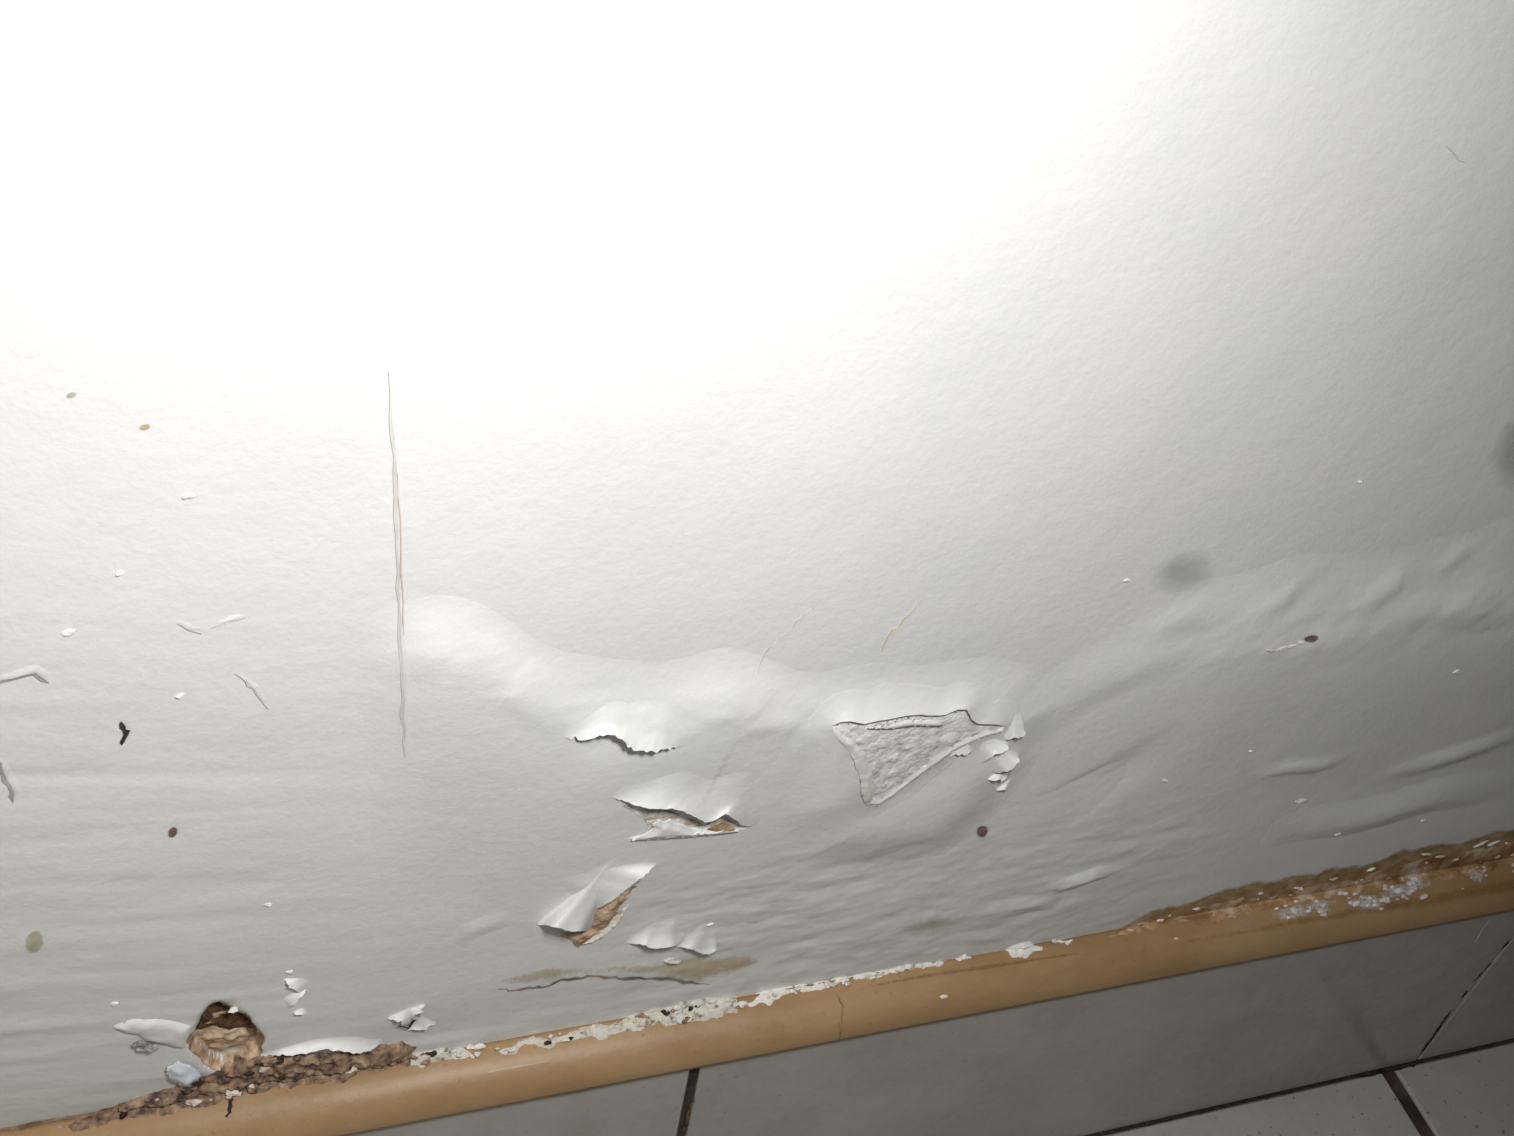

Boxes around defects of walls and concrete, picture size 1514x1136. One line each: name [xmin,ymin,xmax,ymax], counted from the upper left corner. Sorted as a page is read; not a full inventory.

crack [388,372,407,756]
crack [0,665,49,684]
crack [0,757,20,802]
peeling [563,700,689,753]
peeling [613,771,763,841]
peeling [808,682,1026,818]
peeling [537,858,657,946]
peeling [625,917,720,954]
flaking render [48,954,972,1132]